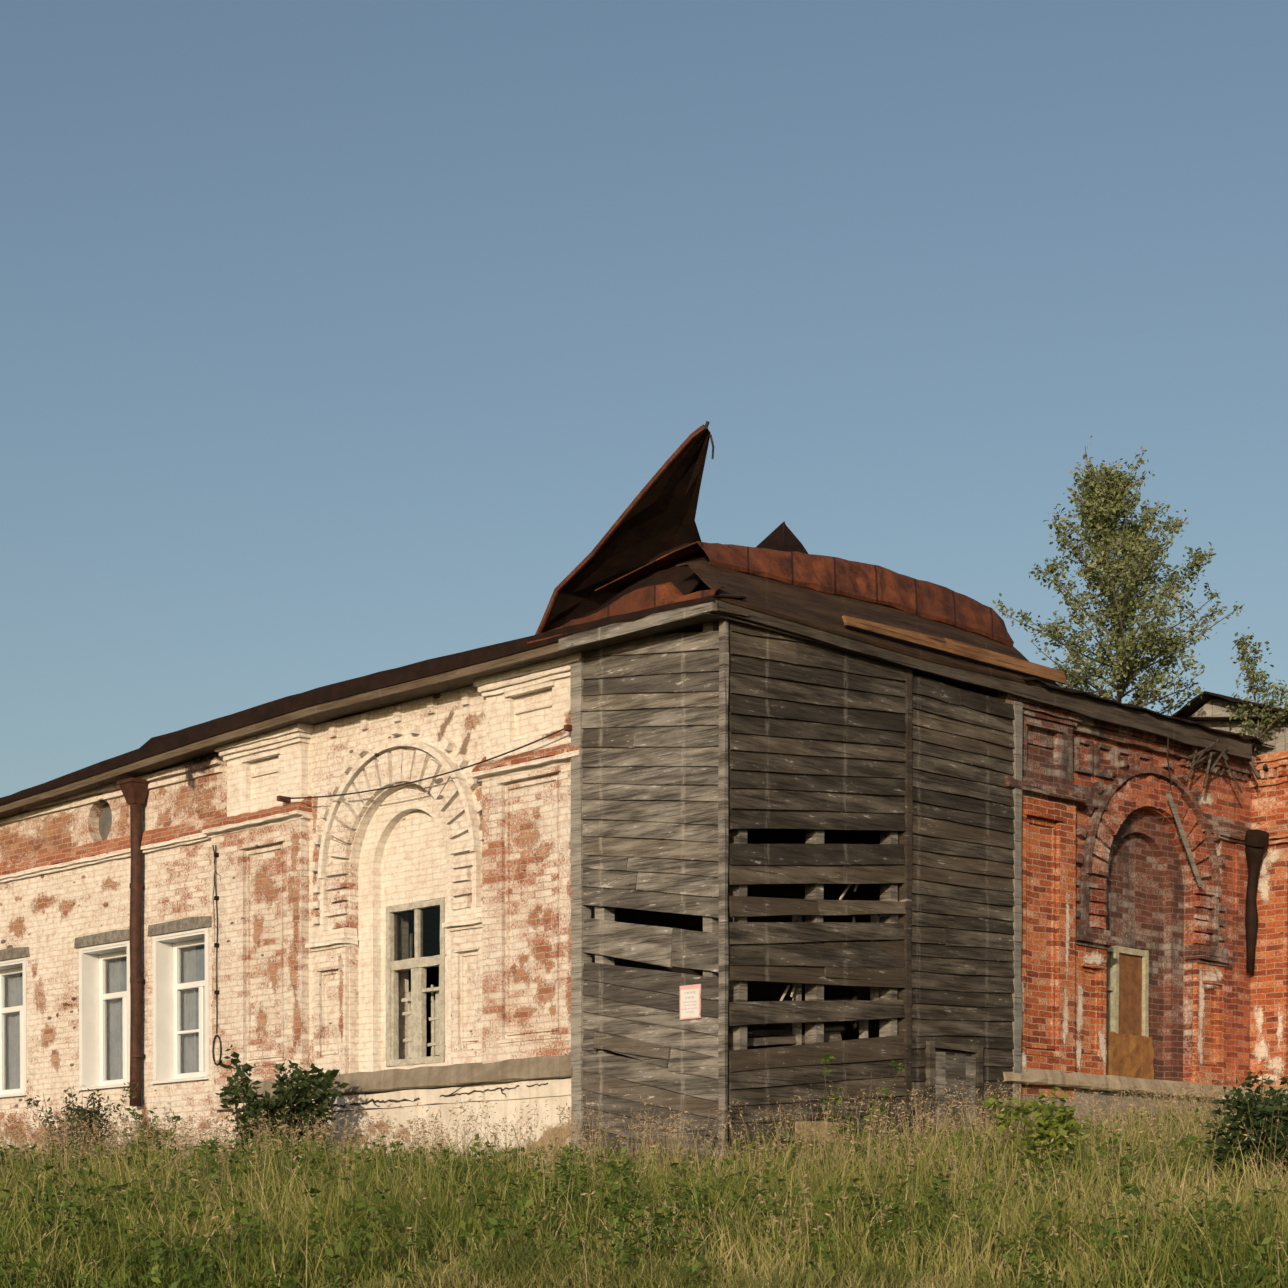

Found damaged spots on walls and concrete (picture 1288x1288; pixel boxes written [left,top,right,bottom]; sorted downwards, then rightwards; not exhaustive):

peeling [0,811,75,861]
peeling [157,775,217,828]
peeling [515,807,553,879]
peeling [0,893,80,938]
peeling [101,877,120,907]
peeling [251,798,320,1047]
peeling [510,905,571,1026]
peeling [32,964,76,1072]